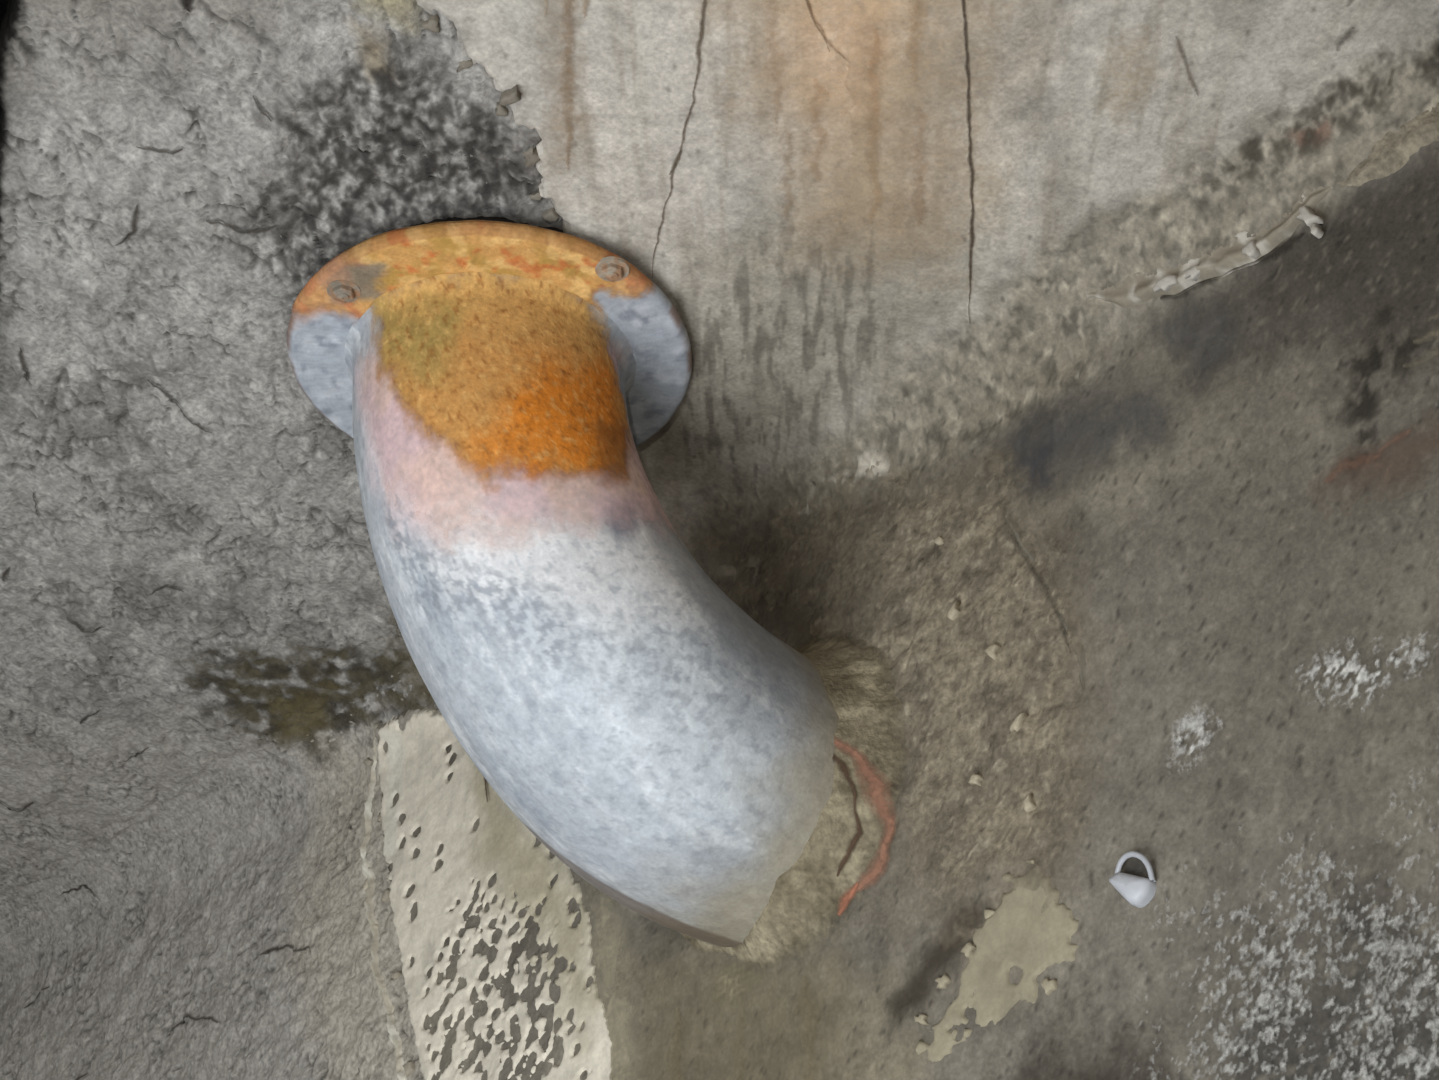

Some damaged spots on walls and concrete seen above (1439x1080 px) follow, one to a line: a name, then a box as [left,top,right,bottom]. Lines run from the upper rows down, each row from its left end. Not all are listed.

crack [181,0,191,12]
damp [260,59,537,281]
crack [652,0,706,279]
crack [962,0,974,321]
crack [116,204,138,245]
flaking render [0,0,636,1080]
damp [1307,639,1424,699]
peeling [935,974,951,990]
peeling [961,942,976,958]
peeling [1041,978,1057,996]
damp [1200,896,1313,1039]
damp [1326,937,1439,1041]